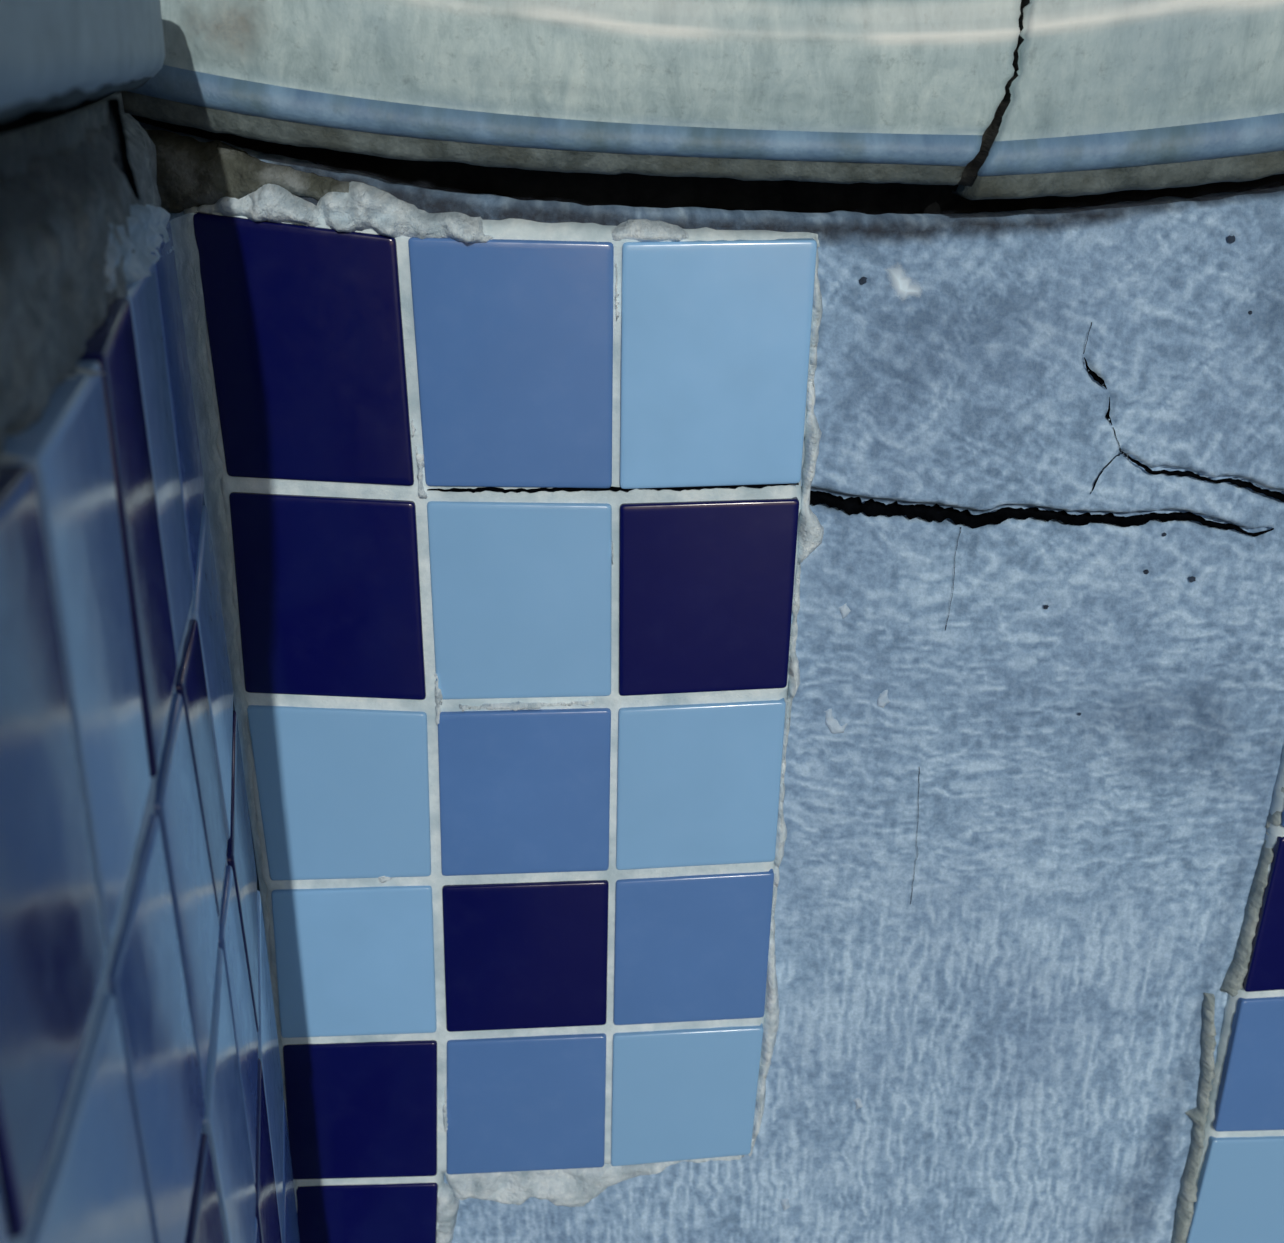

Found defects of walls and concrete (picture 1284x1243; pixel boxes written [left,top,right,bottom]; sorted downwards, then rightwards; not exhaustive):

crack [0,0,1284,215]
crack [427,322,1284,630]
flaking render [221,141,1284,1243]